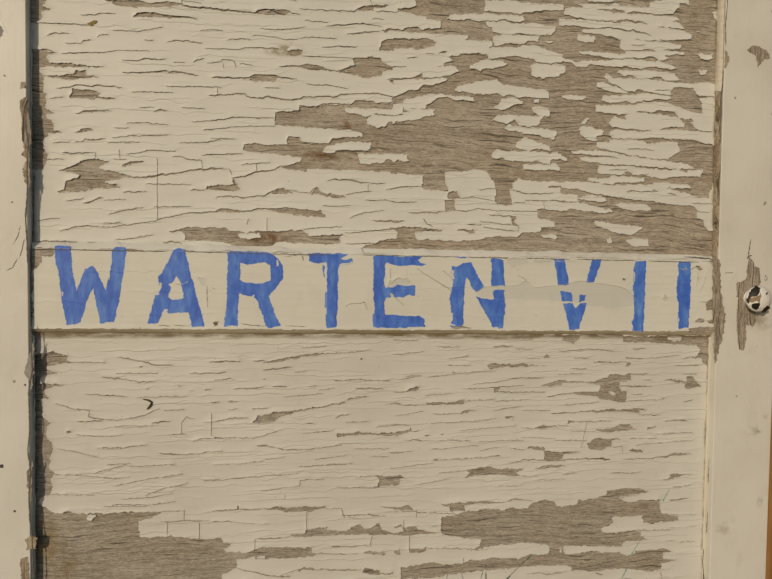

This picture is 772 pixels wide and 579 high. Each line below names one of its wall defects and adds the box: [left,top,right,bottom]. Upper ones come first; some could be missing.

spalling [747,46,770,67]
peeling [20,0,730,366]
peeling [736,258,768,350]
peeling [13,341,701,579]